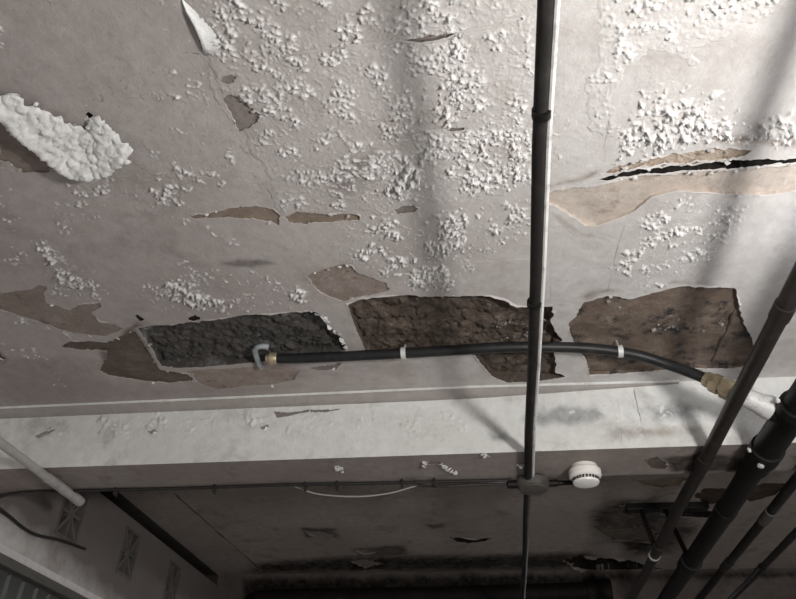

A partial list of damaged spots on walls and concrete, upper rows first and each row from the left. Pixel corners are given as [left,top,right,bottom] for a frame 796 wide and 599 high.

peeling [219,74,263,133]
peeling [0,123,56,174]
spalling [549,147,796,227]
peeling [189,205,361,226]
spalling [0,284,348,390]
spalling [305,264,529,350]
spalling [542,285,754,371]
spalling [455,352,528,383]
spalling [539,352,567,382]
spalling [579,353,669,377]
spalling [564,555,645,572]